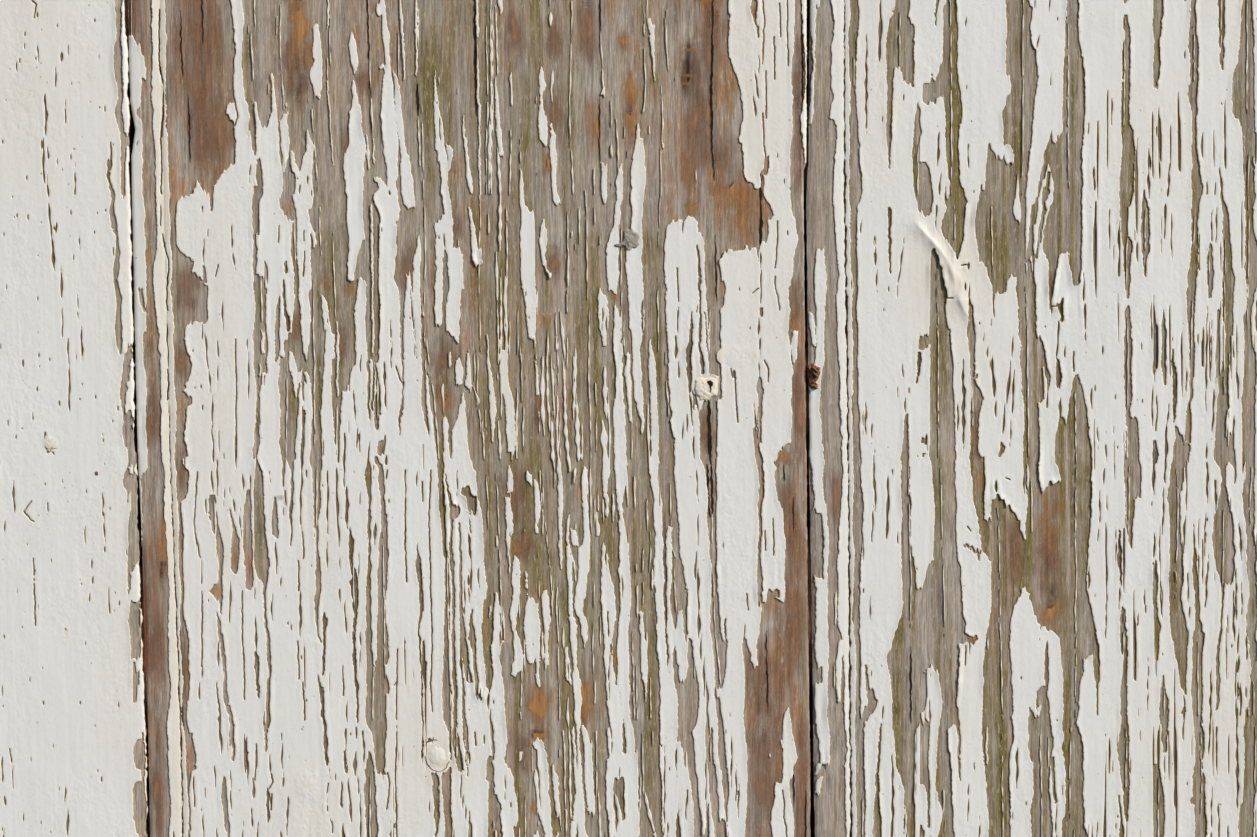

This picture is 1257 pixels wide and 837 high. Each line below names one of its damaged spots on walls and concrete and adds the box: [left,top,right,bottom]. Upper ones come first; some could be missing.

peeling [106,0,774,837]
peeling [742,0,1100,837]
peeling [1117,607,1130,837]
peeling [1119,0,1150,549]
peeling [1152,0,1257,837]